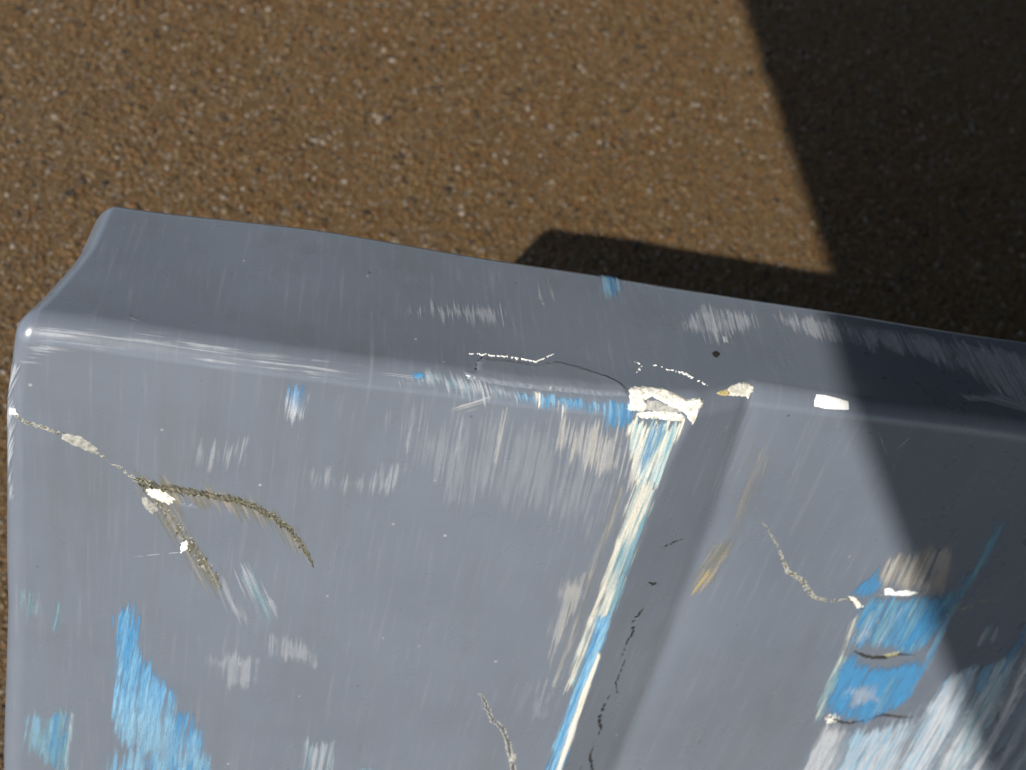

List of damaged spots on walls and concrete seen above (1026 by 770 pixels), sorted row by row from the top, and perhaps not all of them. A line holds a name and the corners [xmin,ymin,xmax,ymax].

peeling [627,386,704,425]
peeling [717,382,753,399]
peeling [814,394,849,410]
crack [9,408,314,588]
crack [762,522,1008,628]
crack [854,650,915,660]
crack [580,582,659,770]
crack [825,690,913,725]
crack [478,693,517,770]